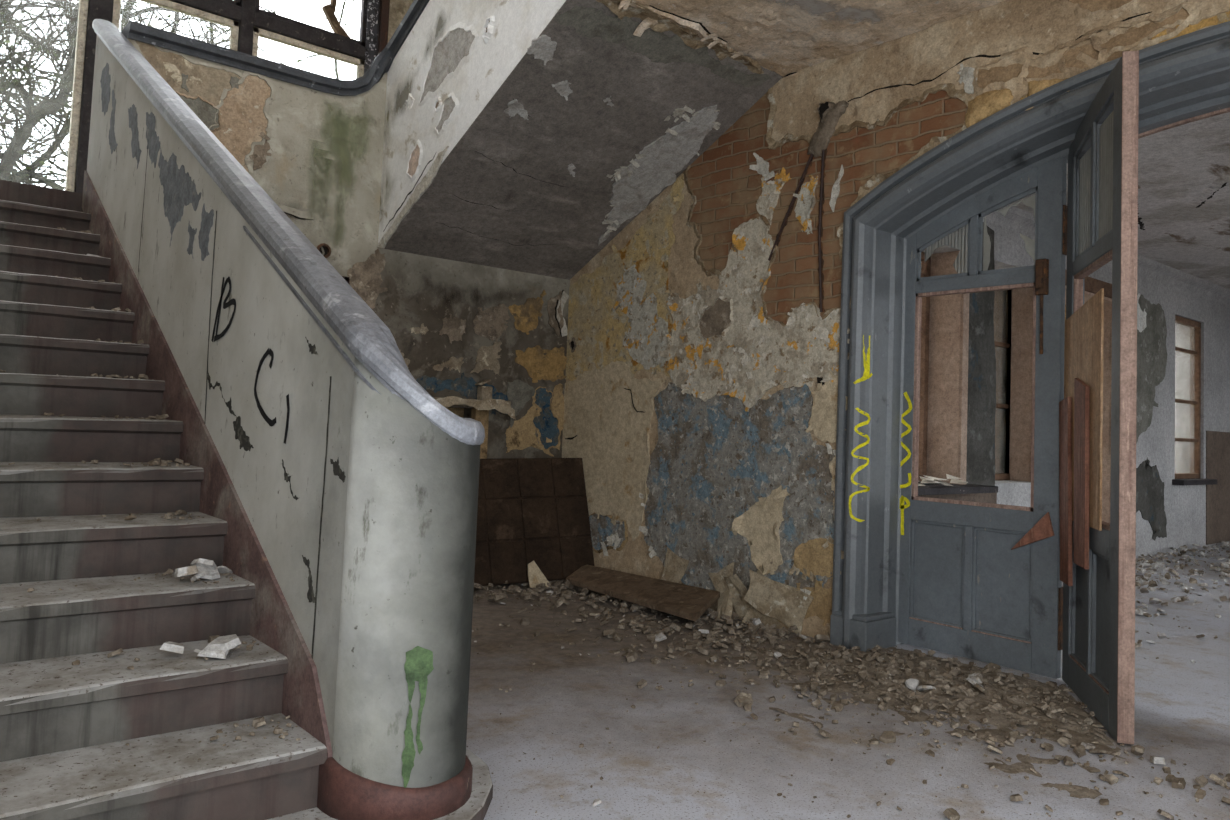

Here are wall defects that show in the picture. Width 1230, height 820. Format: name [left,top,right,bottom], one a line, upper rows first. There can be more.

peeling [100,63,214,261]
peeling [132,40,276,175]
damp [313,107,369,187]
damp [384,80,412,135]
peeling [347,15,495,308]
crack [848,12,1152,114]
crack [1138,204,1146,231]
peeling [400,0,1230,626]